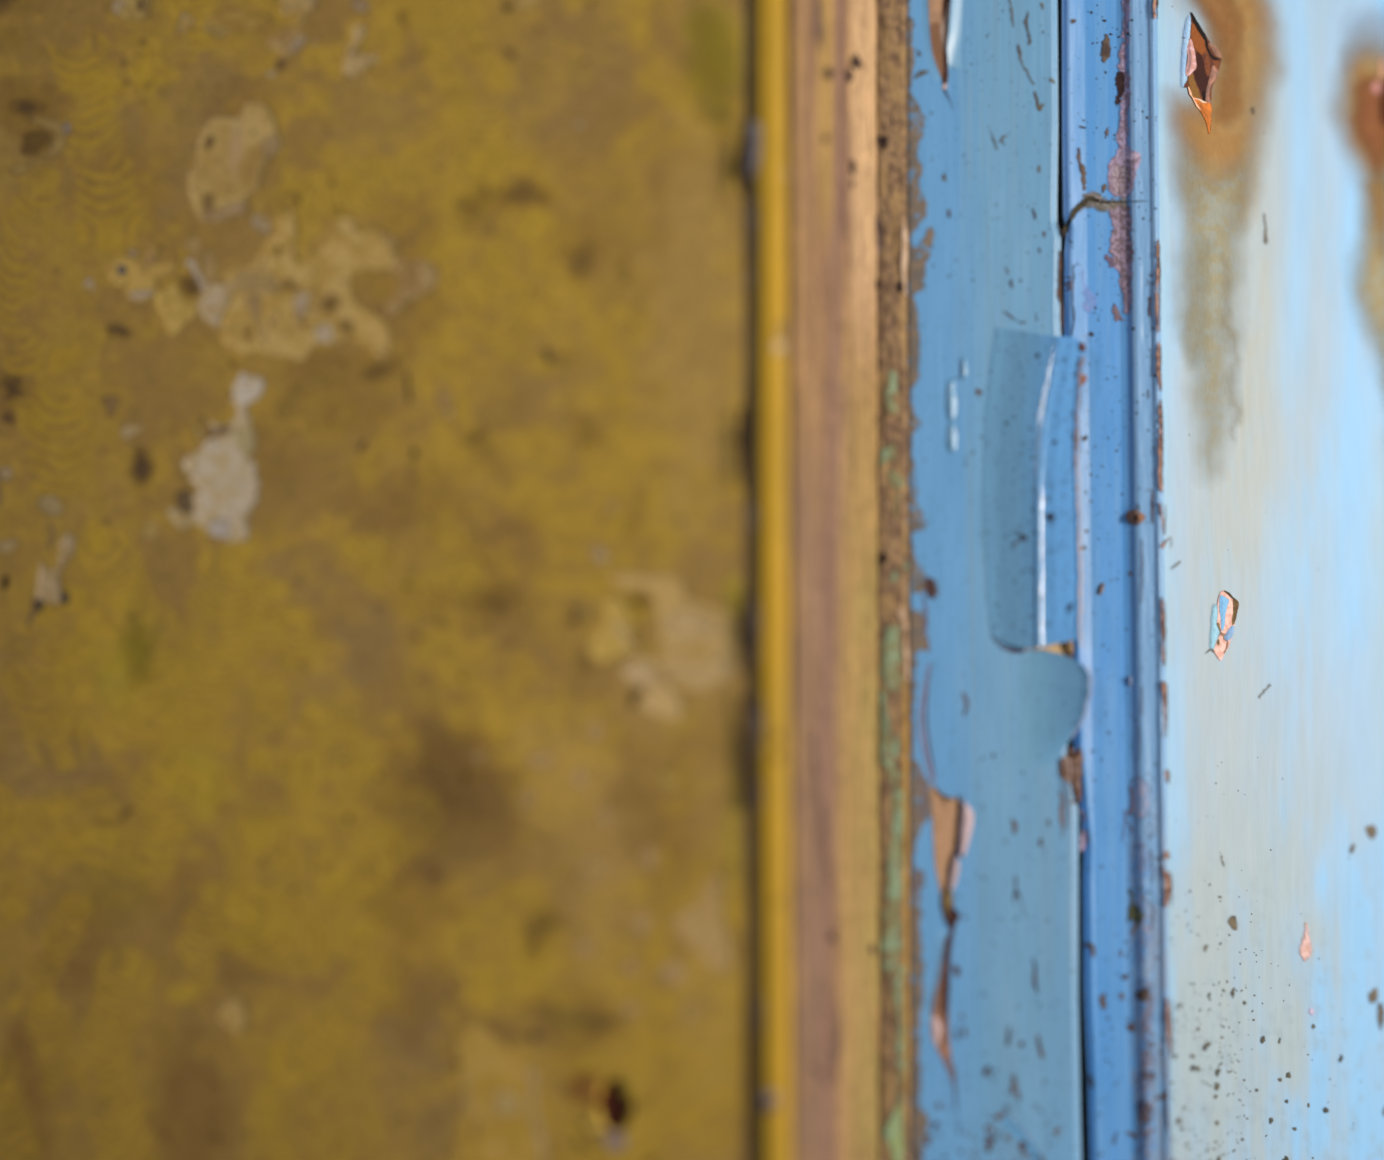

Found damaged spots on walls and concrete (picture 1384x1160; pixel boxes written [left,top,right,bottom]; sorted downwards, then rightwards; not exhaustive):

peeling [167,373,265,543]
peeling [188,101,283,222]
peeling [84,210,439,418]
peeling [589,572,761,722]
peeling [906,0,973,1160]
crack [1057,0,1140,335]
peeling [1105,0,1141,322]
peeling [1186,39,1222,134]
peeling [1206,590,1239,660]
rust [1176,0,1271,442]
rust [1342,30,1384,359]
crack [1077,804,1088,1160]